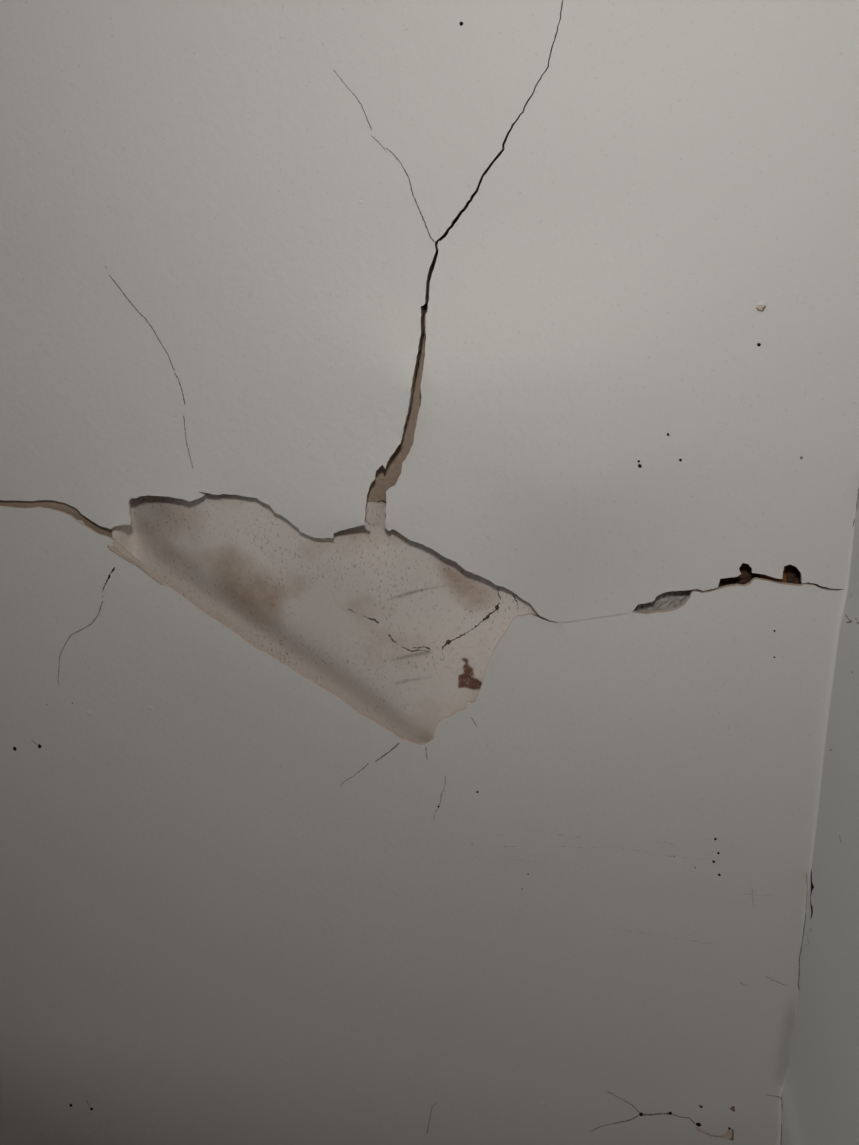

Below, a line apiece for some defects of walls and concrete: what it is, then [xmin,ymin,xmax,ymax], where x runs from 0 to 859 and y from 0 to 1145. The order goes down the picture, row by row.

crack [335,0,563,526]
crack [105,266,193,468]
crack [0,500,114,539]
crack [58,567,115,685]
flaking render [88,492,558,745]
crack [633,563,859,624]
crack [590,1092,734,1141]